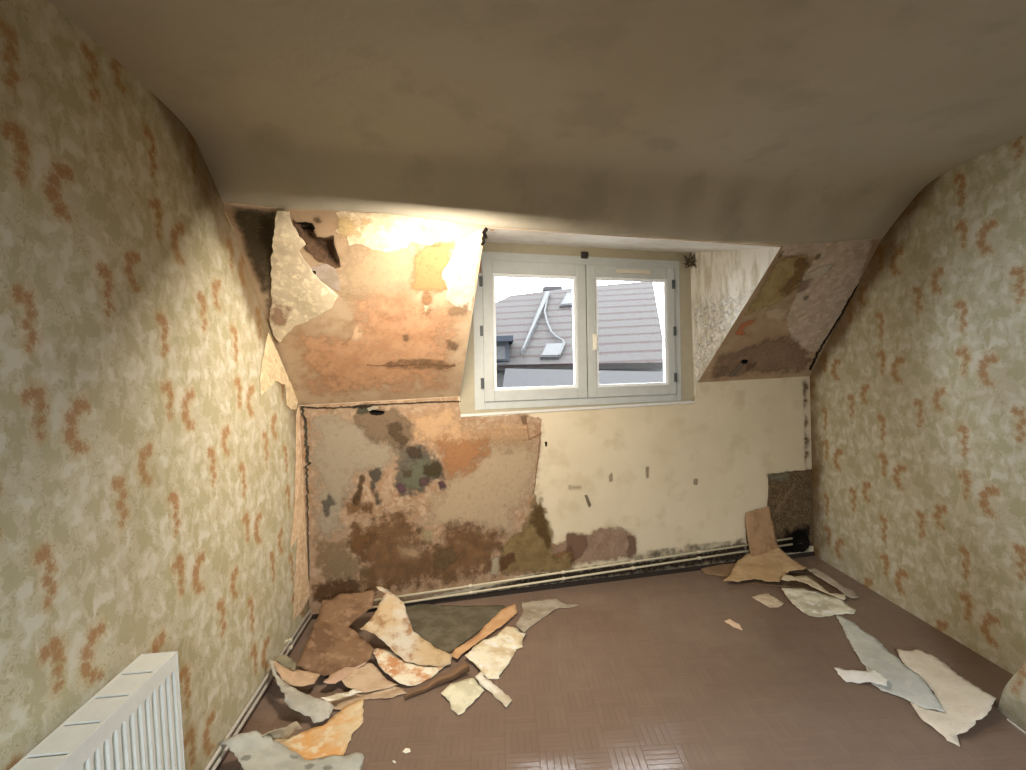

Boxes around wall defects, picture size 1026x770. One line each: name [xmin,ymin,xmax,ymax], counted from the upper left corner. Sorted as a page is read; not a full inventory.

peeling [335,211,483,315]
peeling [765,239,872,353]
peeling [260,333,542,620]
peeling [767,469,814,548]